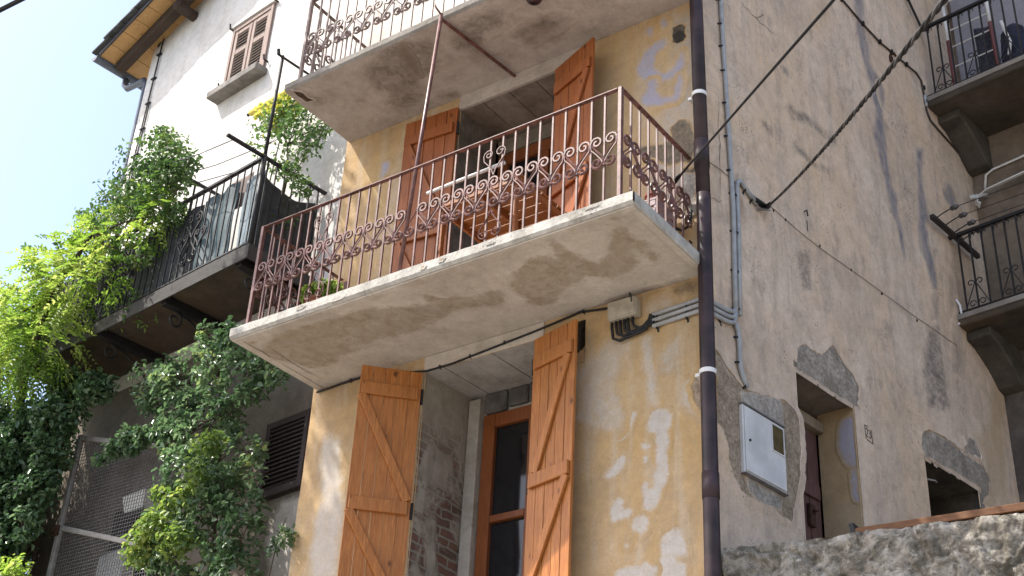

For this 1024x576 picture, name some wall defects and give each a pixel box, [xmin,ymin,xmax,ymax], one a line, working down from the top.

water stain [354,1,581,117]
peeling [631,6,697,232]
water stain [852,0,968,419]
water stain [255,211,698,442]
peeling [599,404,694,576]
flaking render [685,365,701,420]
flaking render [715,342,807,532]
flaking render [790,336,864,506]
peeling [916,373,1011,508]